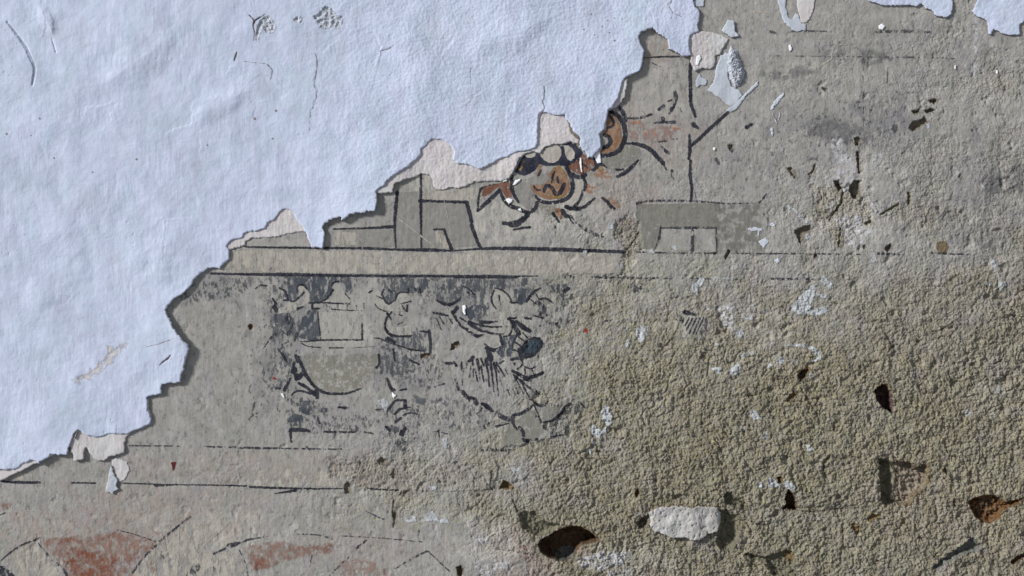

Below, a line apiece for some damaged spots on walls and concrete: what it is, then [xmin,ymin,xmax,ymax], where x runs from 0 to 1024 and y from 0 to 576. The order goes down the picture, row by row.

peeling [778,0,815,32]
peeling [868,0,953,18]
peeling [972,0,1024,35]
peeling [0,0,758,494]